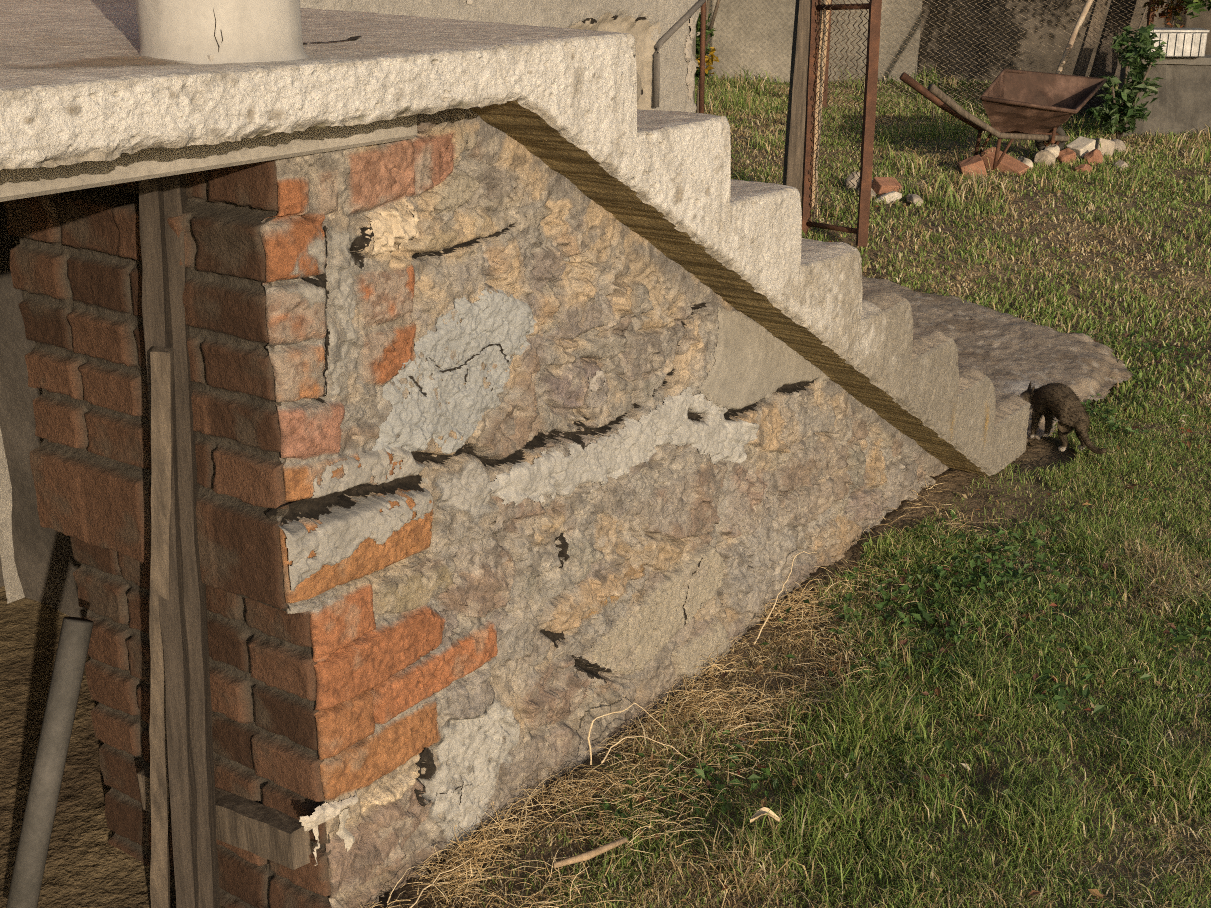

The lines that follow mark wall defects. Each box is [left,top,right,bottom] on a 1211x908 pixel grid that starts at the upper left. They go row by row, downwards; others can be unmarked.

spalling [349,204,419,268]
crack [265,303,707,524]
spalling [414,748,437,808]
peeling [299,792,359,866]